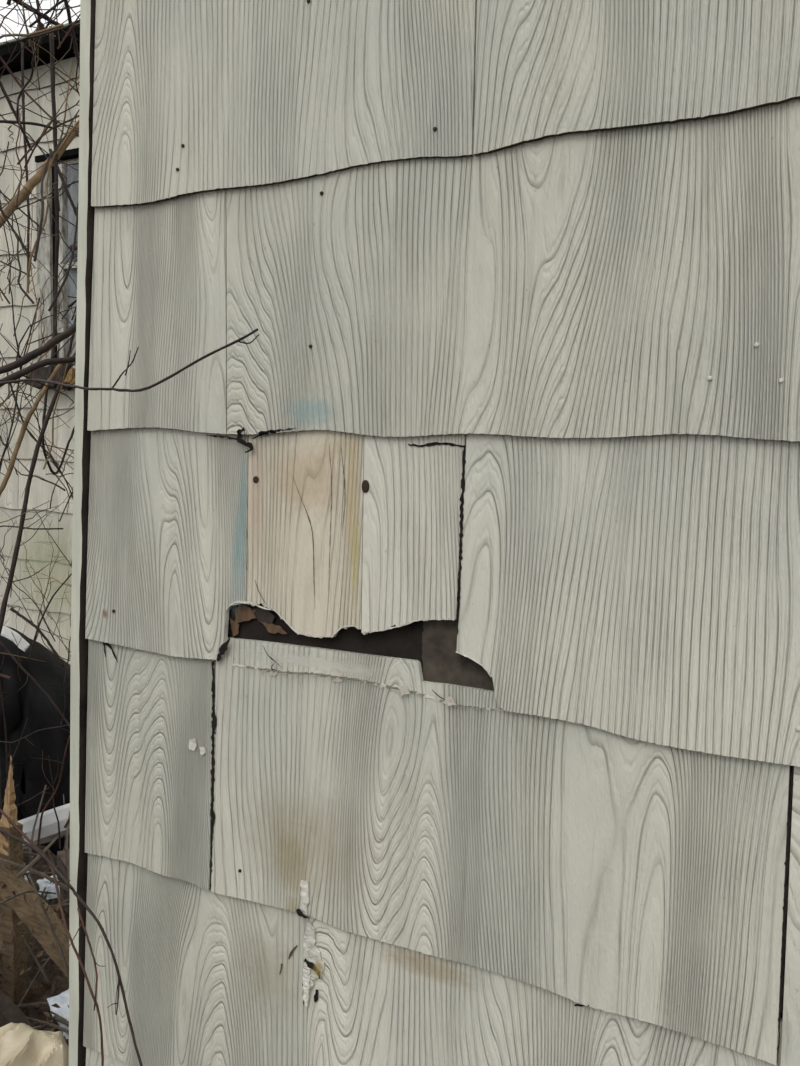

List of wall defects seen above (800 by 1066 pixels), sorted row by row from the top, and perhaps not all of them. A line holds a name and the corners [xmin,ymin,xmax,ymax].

spalling [228,600,508,712]
crack [209,637,230,889]
spalling [279,880,325,1008]